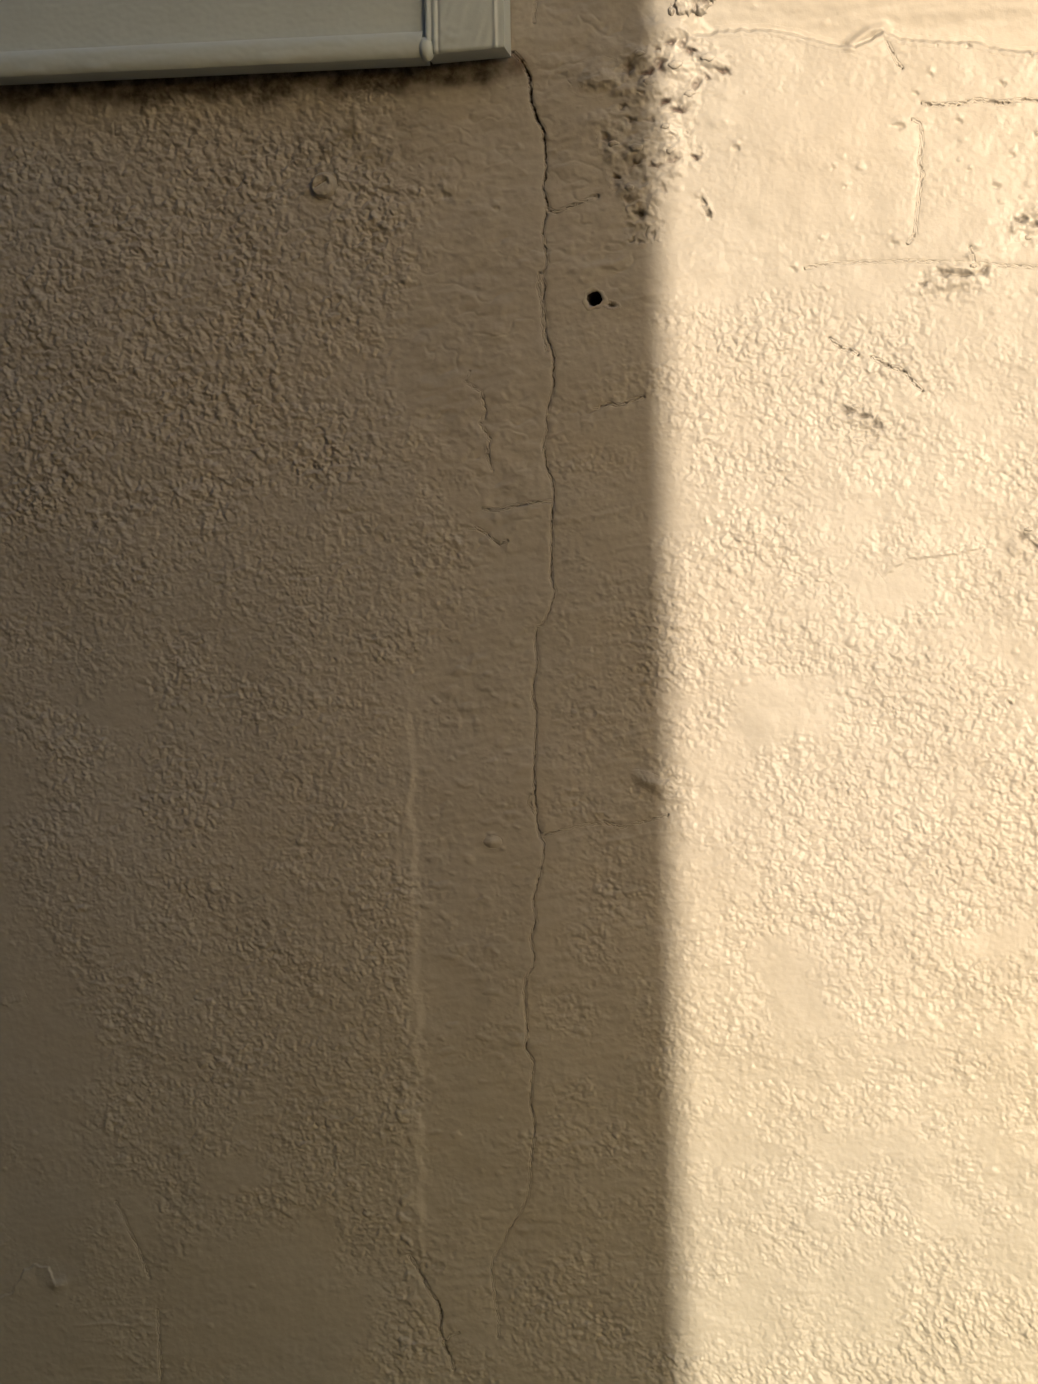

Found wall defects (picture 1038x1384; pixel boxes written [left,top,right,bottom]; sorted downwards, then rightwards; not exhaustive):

flaking render [593,0,1038,248]
crack [884,38,903,69]
crack [805,96,1038,270]
crack [469,52,668,1338]
crack [407,1254,459,1370]